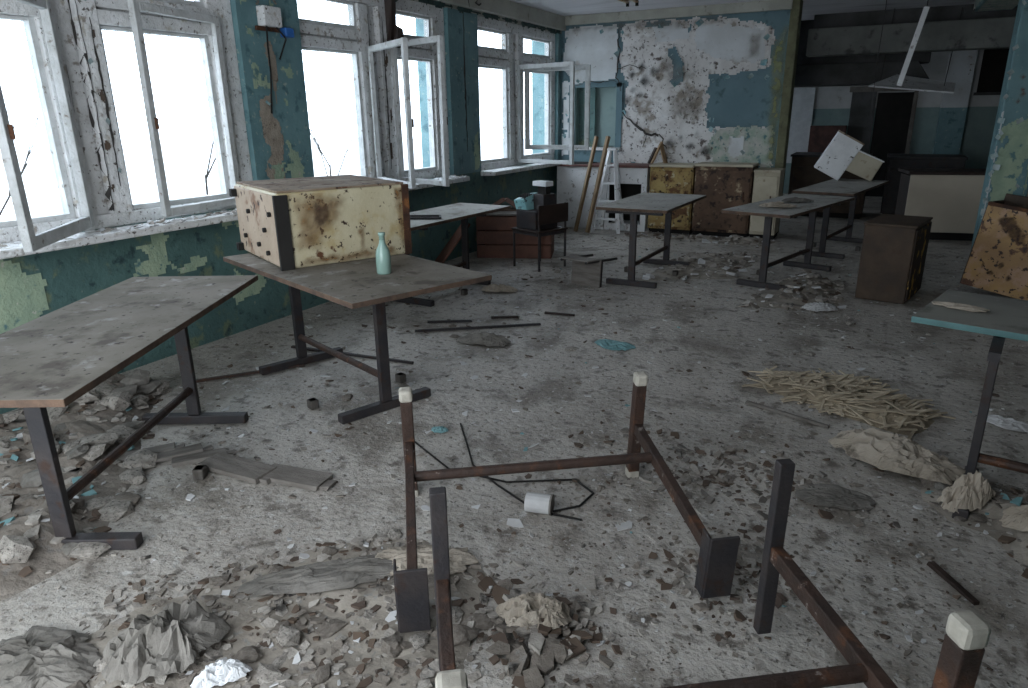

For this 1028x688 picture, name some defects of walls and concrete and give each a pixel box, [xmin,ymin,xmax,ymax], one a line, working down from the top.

peeling [67,0,122,211]
spalling [245,26,305,179]
peeling [382,23,393,169]
peeling [413,0,777,168]
peeling [980,94,1028,219]
peeling [0,259,49,334]
peeling [133,233,207,277]
peeling [233,274,267,305]